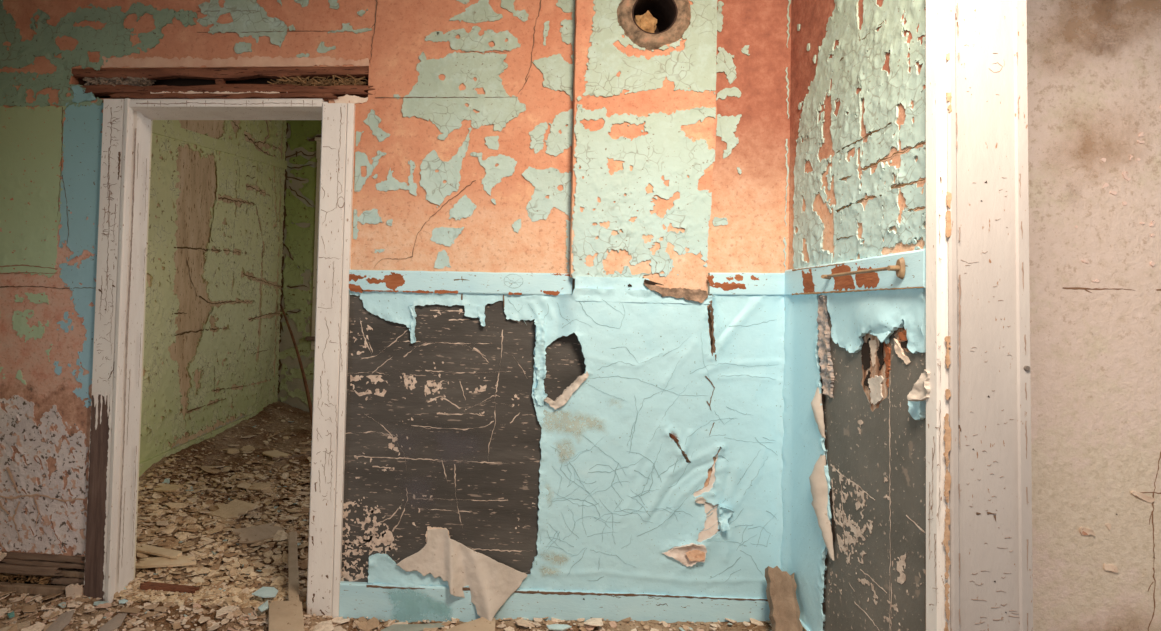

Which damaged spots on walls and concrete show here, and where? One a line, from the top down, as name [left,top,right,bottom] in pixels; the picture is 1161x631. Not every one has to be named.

peeling [334,0,759,294]
peeling [793,0,926,293]
crack [956,87,1019,148]
flaking render [0,0,372,601]
peeling [350,375,402,400]
crack [508,299,778,601]
flaking render [861,325,911,411]
crack [836,123,1028,631]
crack [1062,286,1161,294]
crack [366,583,425,591]
peeling [831,465,900,631]
crack [1140,452,1161,631]